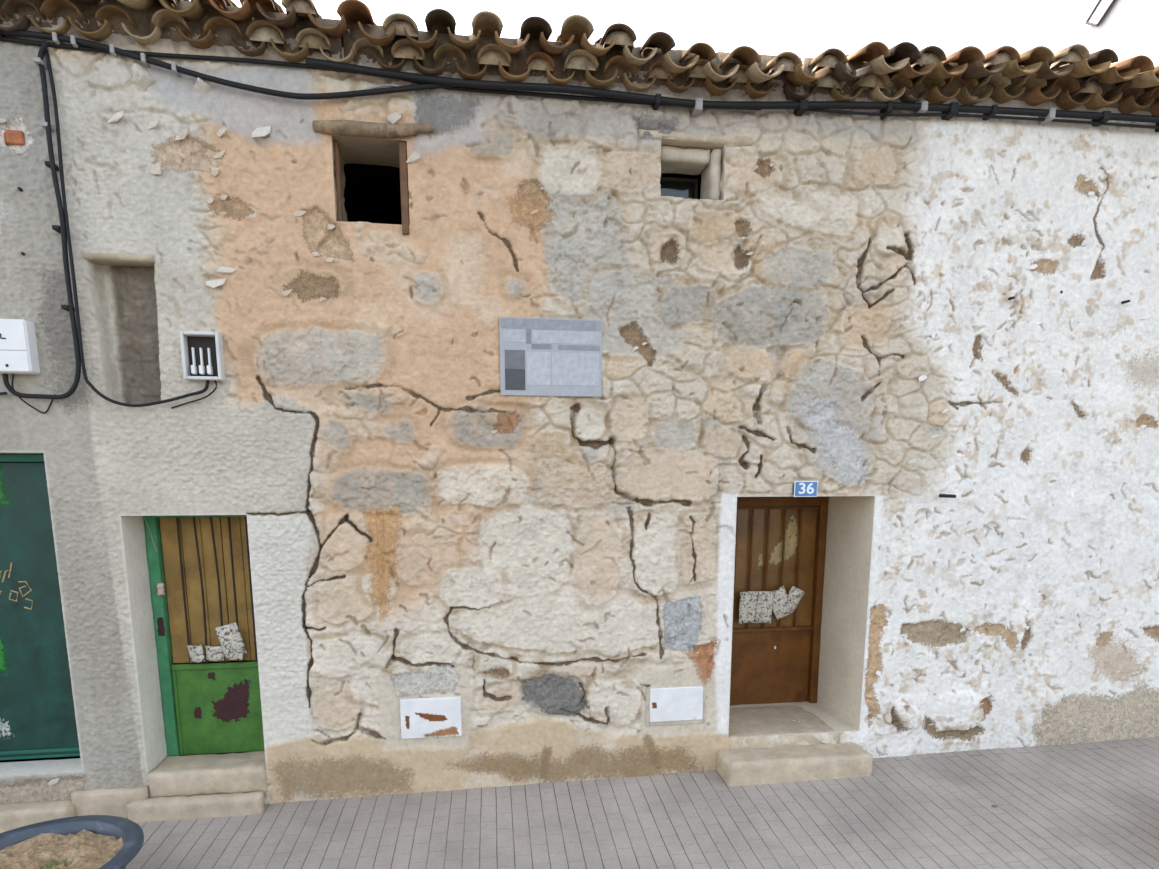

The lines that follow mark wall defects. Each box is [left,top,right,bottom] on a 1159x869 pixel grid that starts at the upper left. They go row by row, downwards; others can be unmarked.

spalling [282,270,339,302]
spalling [660,239,682,264]
crack [856,234,916,309]
spalling [619,321,656,366]
crack [861,336,904,401]
crack [348,384,506,426]
crack [246,375,373,708]
crack [391,404,697,724]
spalling [865,600,1033,741]
peeling [1032,685,1159,746]
damp [275,757,412,799]
damp [456,735,697,783]